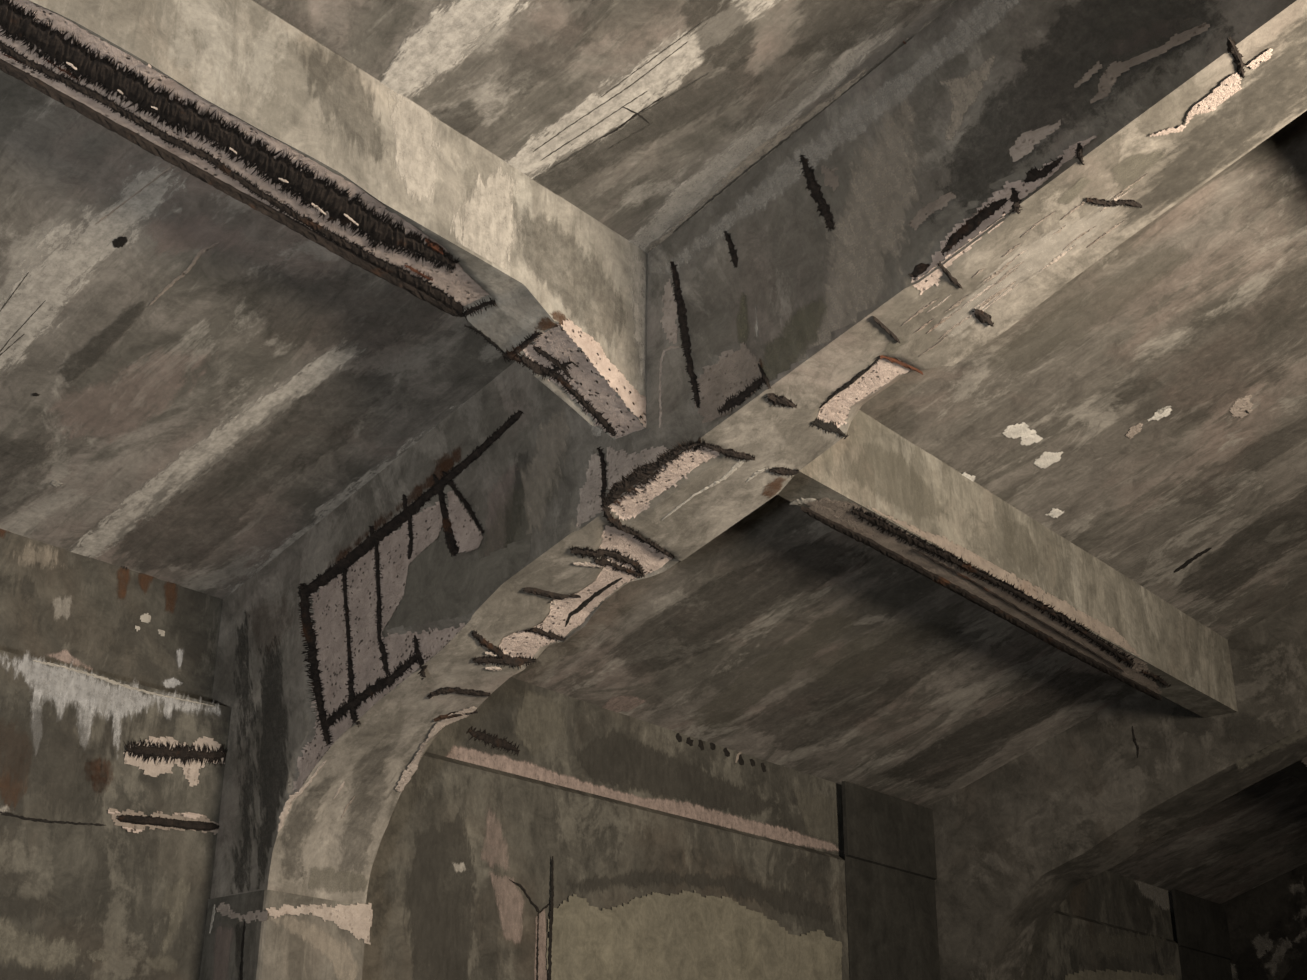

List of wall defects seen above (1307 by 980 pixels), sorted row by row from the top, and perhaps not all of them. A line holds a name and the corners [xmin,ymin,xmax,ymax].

spalling [0,0,497,322]
spalling [908,119,1096,295]
spalling [1086,198,1142,208]
spalling [811,316,923,440]
spalling [972,308,994,327]
spalling [278,261,799,832]
spalling [790,497,1171,700]
crack [0,807,106,826]
damp [0,650,220,790]
spalling [108,808,219,835]
spalling [123,736,228,787]
spalling [209,902,373,945]